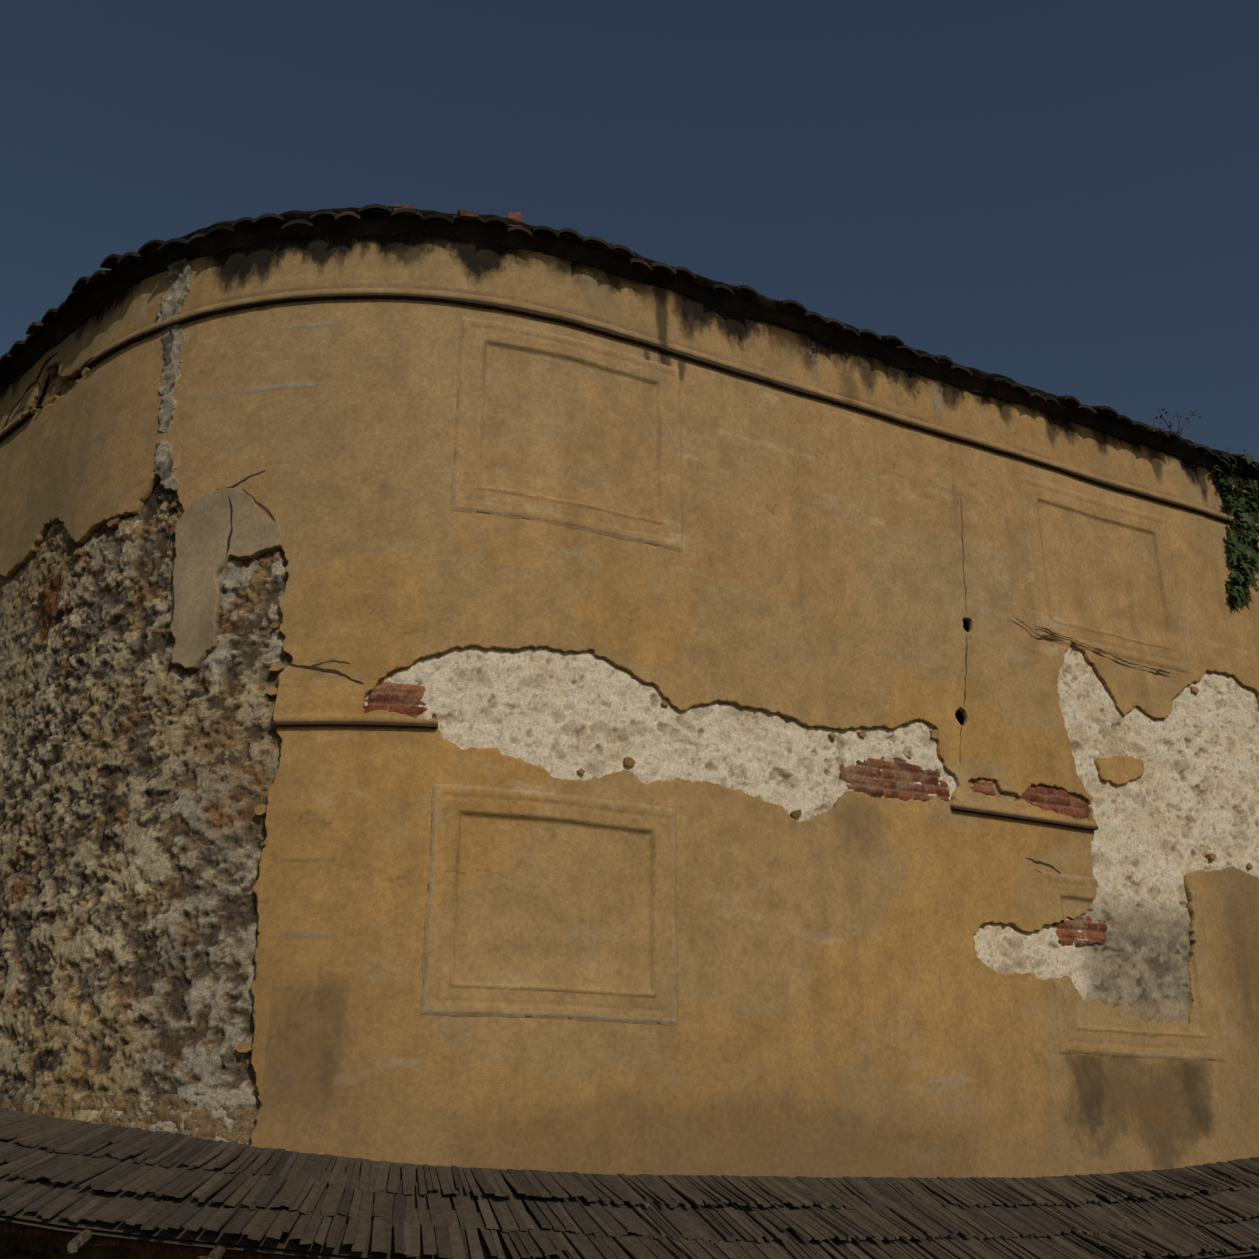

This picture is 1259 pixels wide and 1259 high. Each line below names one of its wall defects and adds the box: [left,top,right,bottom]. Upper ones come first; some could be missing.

damp [207,235,519,290]
damp [682,294,761,342]
crack [2,351,58,429]
damp [809,336,990,410]
damp [1029,407,1075,438]
crack [960,497,968,760]
flaking render [0,479,293,1145]
flaking render [364,645,1259,1024]